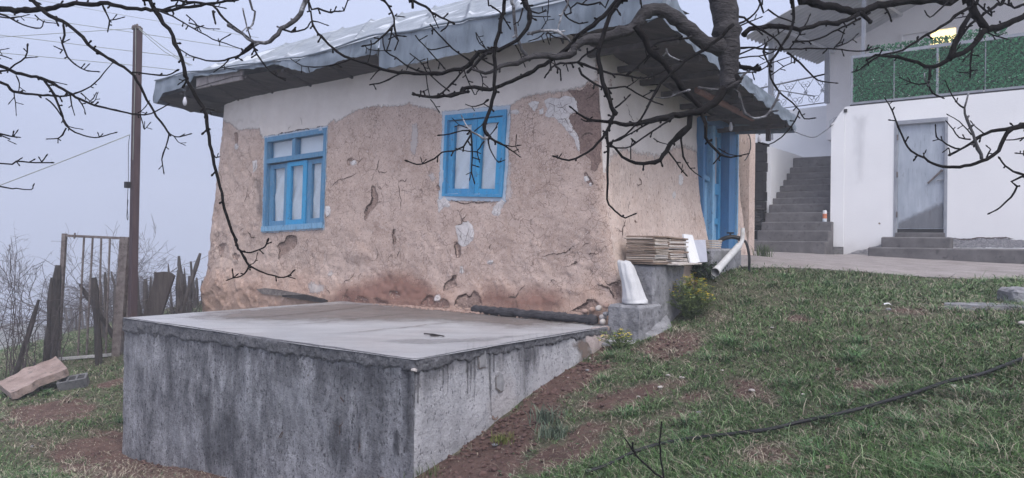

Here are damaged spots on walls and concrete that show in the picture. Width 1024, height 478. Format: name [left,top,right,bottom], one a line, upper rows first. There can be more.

spalling [510,79,612,186]
spalling [364,185,381,220]
spalling [277,235,297,259]
peeling [420,173,482,310]
damp [226,277,556,325]